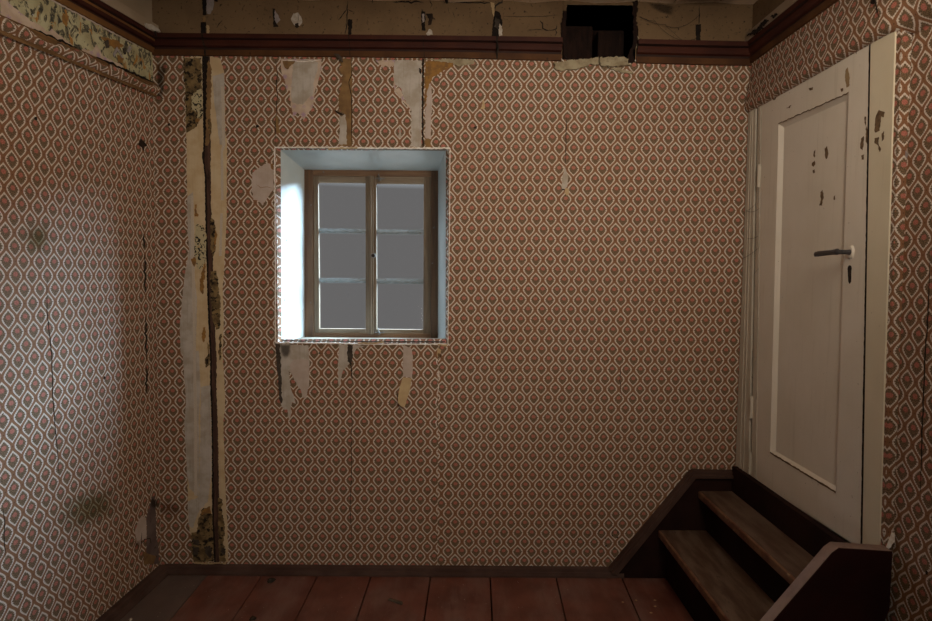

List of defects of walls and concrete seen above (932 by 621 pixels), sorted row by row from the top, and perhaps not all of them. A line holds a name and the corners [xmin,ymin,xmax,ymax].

crack [339,0,557,59]
spalling [553,0,639,74]
peeling [860,110,885,160]